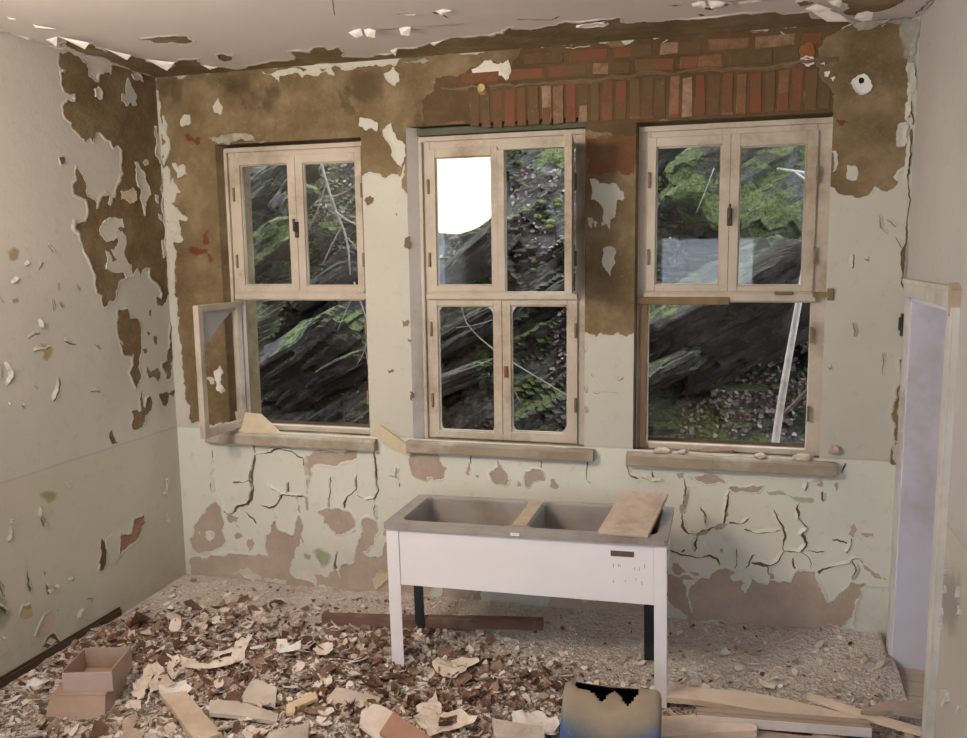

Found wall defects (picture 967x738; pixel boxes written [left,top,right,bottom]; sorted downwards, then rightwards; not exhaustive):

peeling [45,0,920,431]
peeling [0,361,14,387]
crack [209,445,403,524]
peeling [407,453,449,483]
peeling [466,457,559,489]
peeling [677,472,838,503]
peeling [97,511,147,573]
peeling [187,449,389,592]
crack [627,462,866,580]
peeling [400,574,481,600]
peeling [548,597,644,612]
peeling [668,563,886,629]